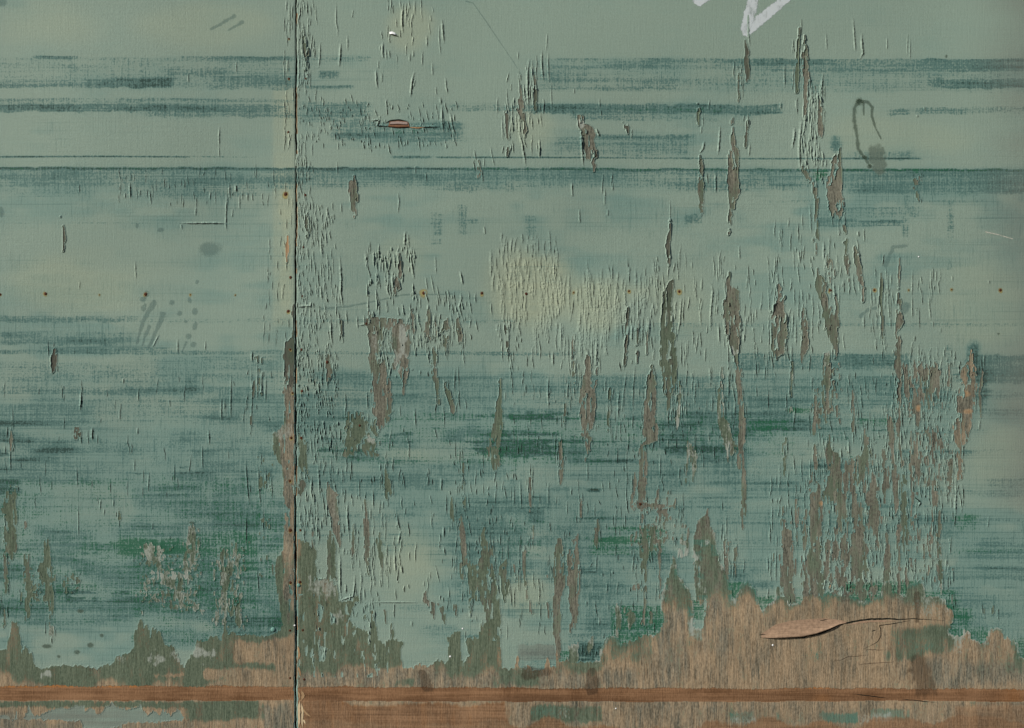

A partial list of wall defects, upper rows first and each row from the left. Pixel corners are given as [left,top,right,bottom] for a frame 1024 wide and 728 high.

peeling [733,39,751,103]
peeling [696,154,705,217]
peeling [725,114,751,236]
peeling [791,19,848,256]
peeling [555,333,634,463]
peeling [618,219,703,486]
peeling [712,250,764,531]
peeling [0,484,20,629]
peeling [18,536,82,644]
peeling [422,572,458,625]